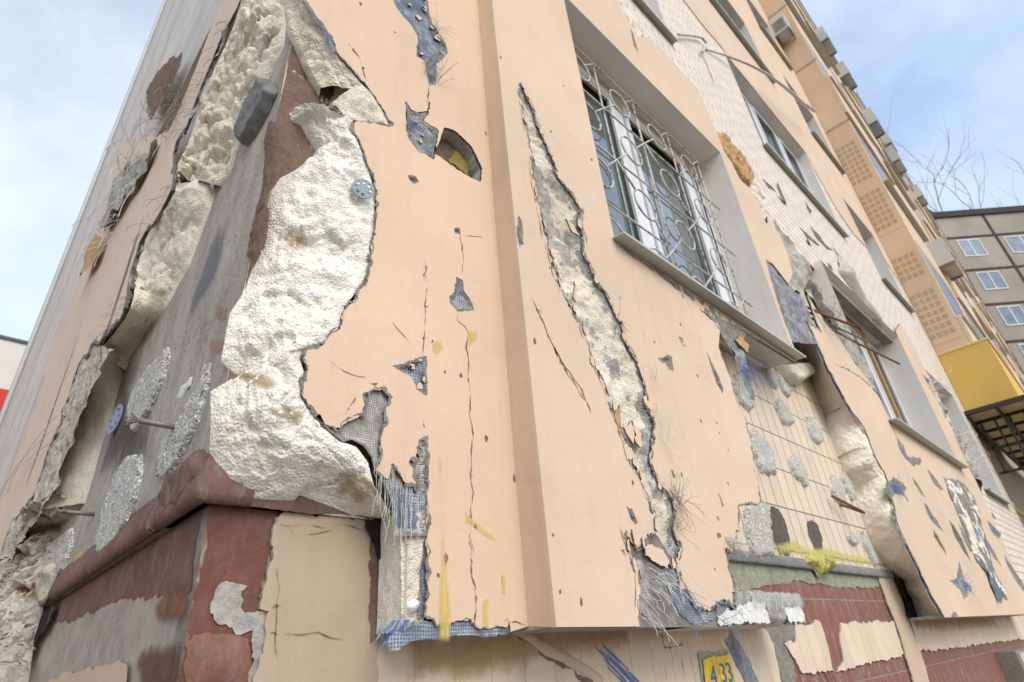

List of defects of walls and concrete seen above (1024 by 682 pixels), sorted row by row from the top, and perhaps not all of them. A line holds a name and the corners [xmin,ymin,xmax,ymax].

flaking render [2,3,239,546]
spalling [245,45,337,289]
flaking render [299,44,511,644]
flaking render [394,0,457,86]
crack [457,317,477,620]
crack [534,302,591,412]
flaking render [516,83,880,682]
flaking render [740,179,1024,618]
peeling [210,581,267,682]